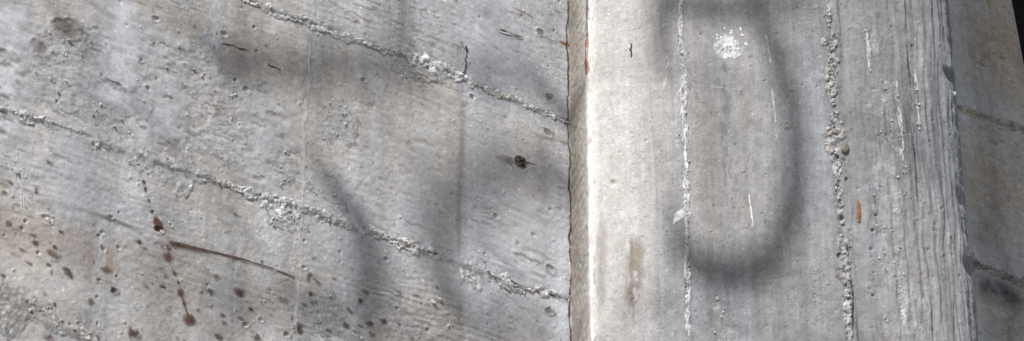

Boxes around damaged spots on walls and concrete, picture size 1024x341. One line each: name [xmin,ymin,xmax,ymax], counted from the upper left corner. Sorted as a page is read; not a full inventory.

damp [586,0,640,341]